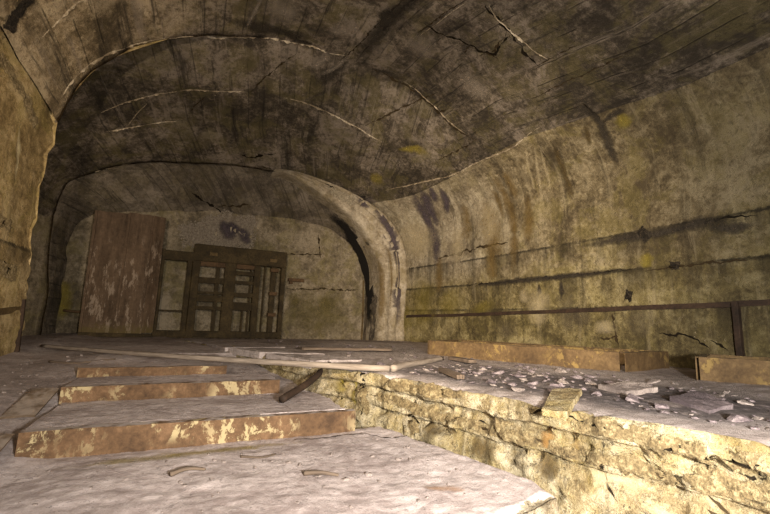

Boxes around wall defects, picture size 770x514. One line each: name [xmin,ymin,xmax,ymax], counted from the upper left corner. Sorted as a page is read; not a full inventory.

crack [418,1,577,66]
crack [0,52,39,130]
crack [367,69,477,160]
crack [0,213,13,230]
damp [414,188,450,288]
damp [469,268,636,296]
crack [660,332,727,350]
crack [294,373,770,514]